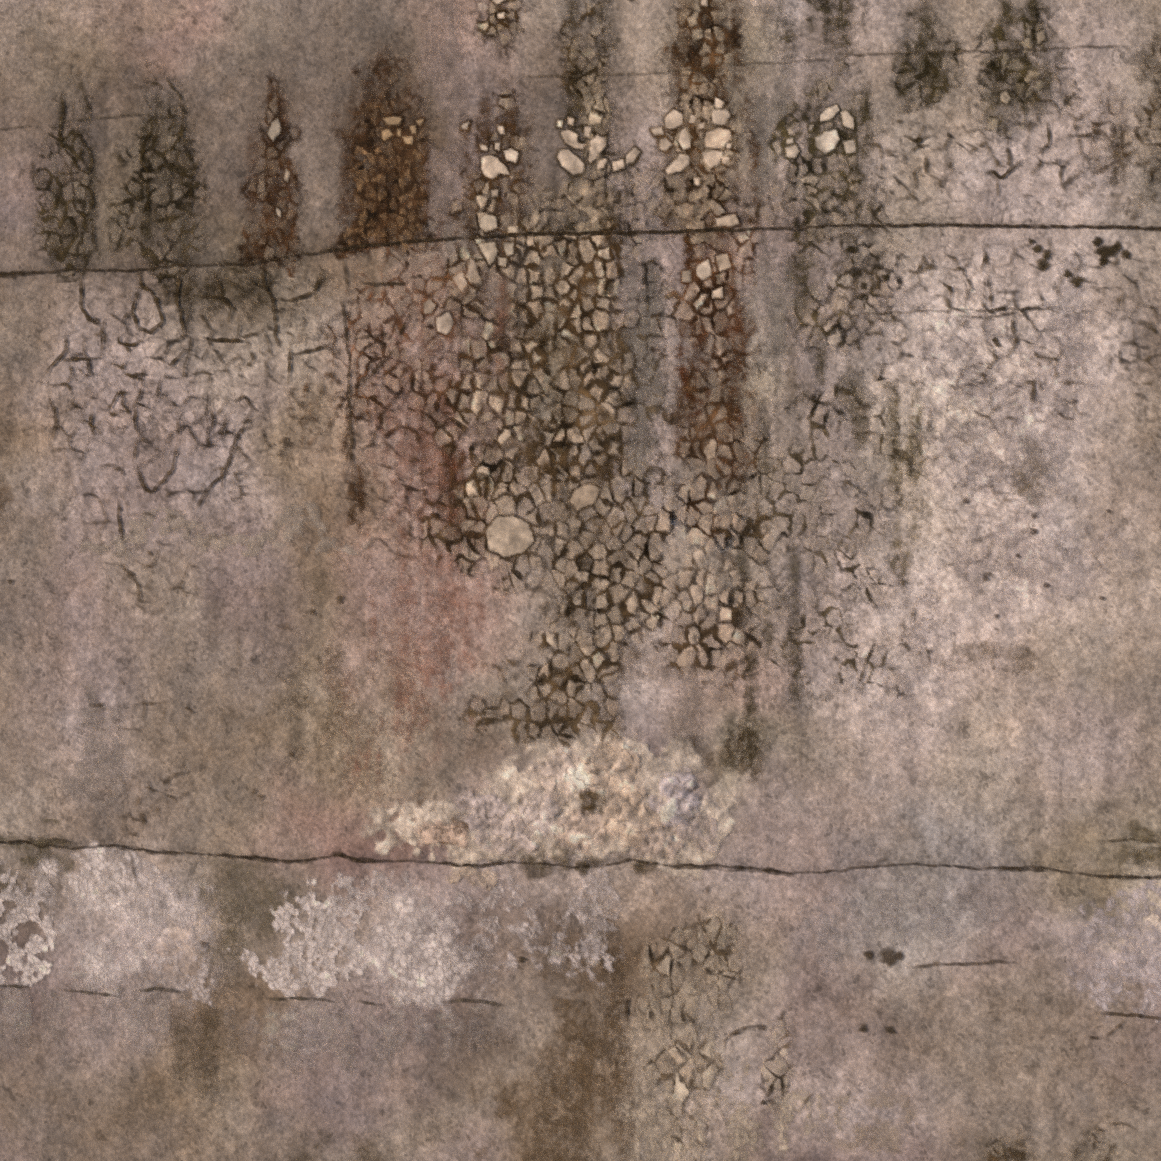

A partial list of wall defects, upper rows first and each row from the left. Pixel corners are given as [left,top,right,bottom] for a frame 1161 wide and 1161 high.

rust [336,106,429,259]
crack [0,45,1161,560]
peeling [335,0,902,749]
peeling [877,410,909,461]
crack [123,551,186,599]
crack [0,777,1150,894]
damp [0,839,619,1046]
peeling [645,916,736,1021]
peeling [649,1040,713,1104]
crack [731,1025,765,1035]
peeling [760,1014,790,1105]